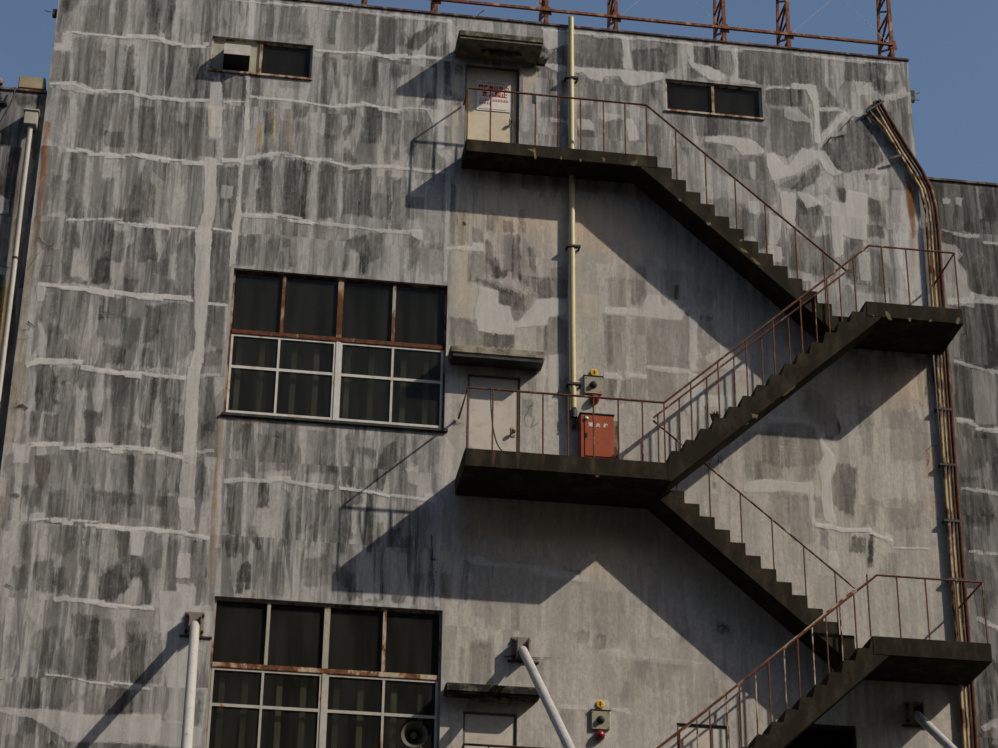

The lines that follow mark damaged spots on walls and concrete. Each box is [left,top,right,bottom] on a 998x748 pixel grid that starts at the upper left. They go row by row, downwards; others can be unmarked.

rust [905,175,915,233]
damp [258,481,270,508]
damp [341,446,396,552]
damp [236,563,251,593]